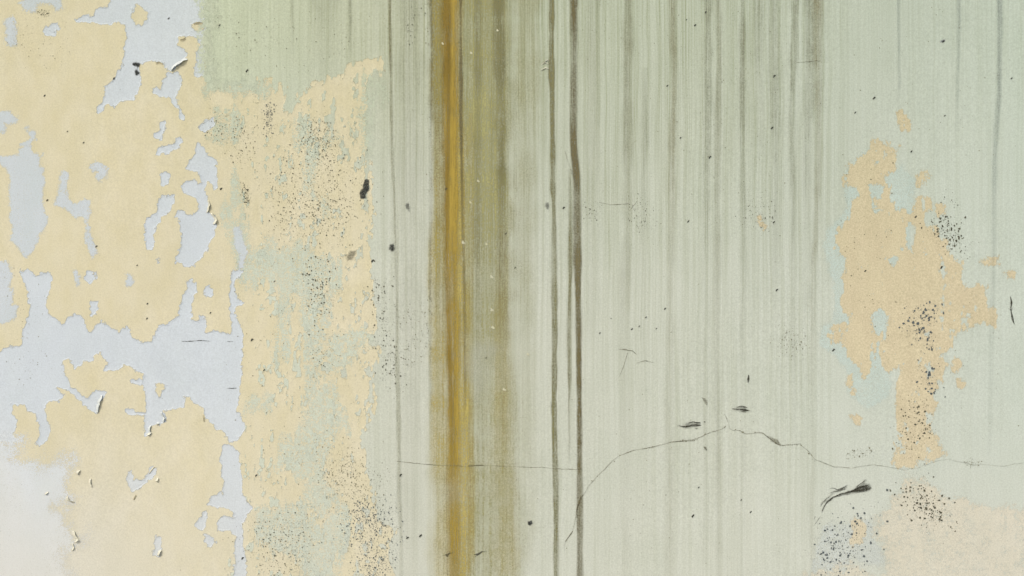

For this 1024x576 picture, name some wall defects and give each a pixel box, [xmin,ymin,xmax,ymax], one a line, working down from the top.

peeling [0,0,398,576]
rust [430,0,472,576]
leakage [461,0,508,375]
leakage [549,0,597,576]
peeling [802,109,1024,576]